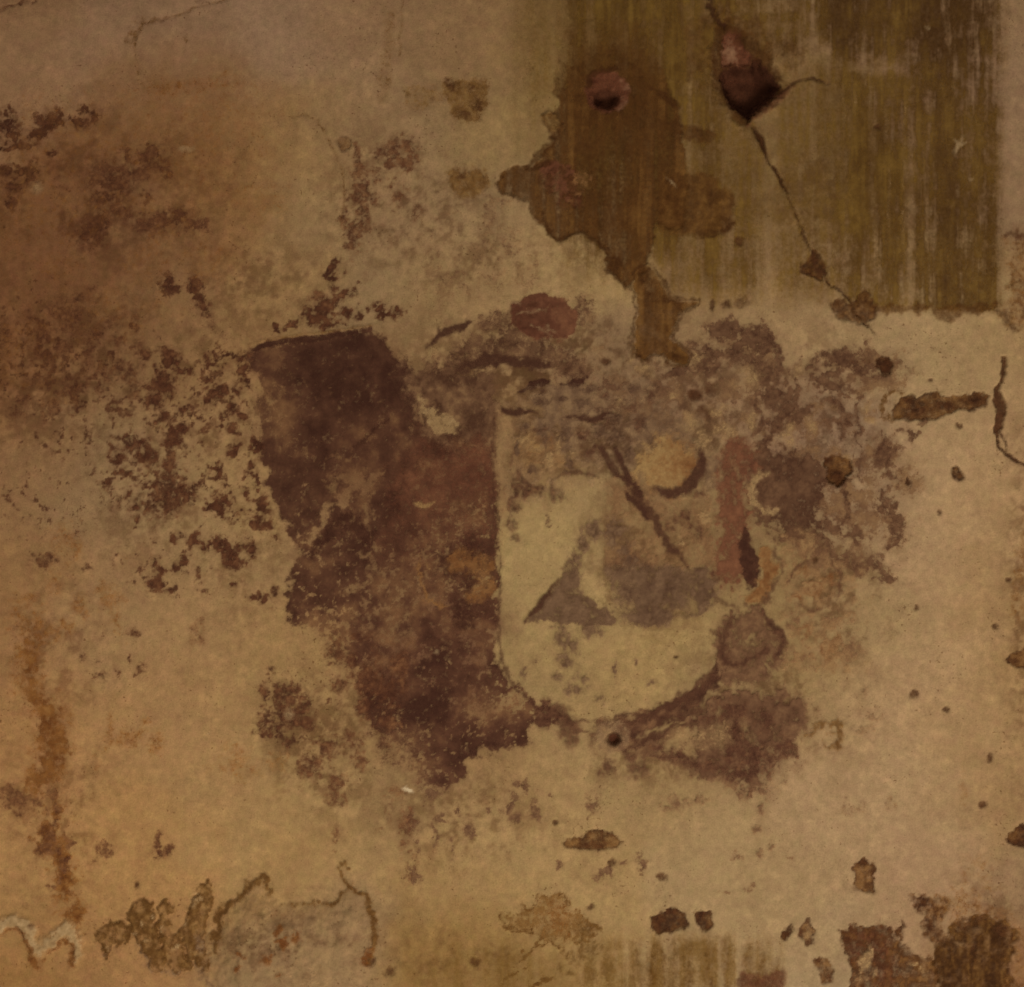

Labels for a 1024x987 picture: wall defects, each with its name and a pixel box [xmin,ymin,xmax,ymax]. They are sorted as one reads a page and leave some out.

flaking render [706,0,783,125]
damp [0,104,99,210]
damp [70,139,209,251]
flaking render [448,60,741,367]
crack [754,130,787,192]
damp [157,272,212,318]
damp [0,286,277,594]
flaking render [880,379,988,428]
crack [993,357,1024,465]
damp [252,667,367,803]
flaking render [651,908,713,934]
flaking render [841,894,1022,987]